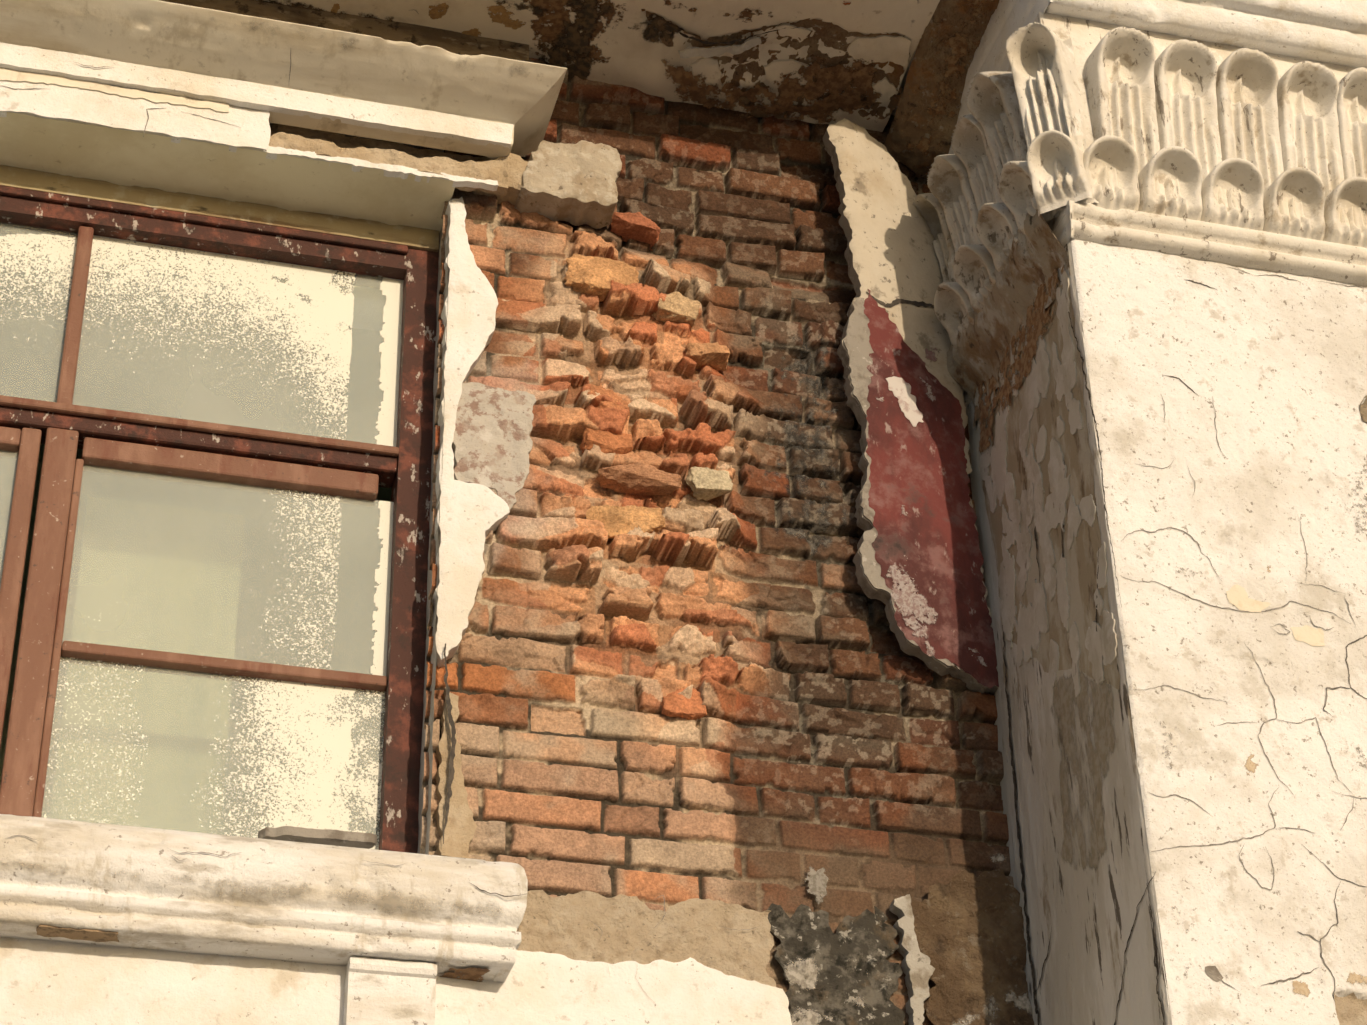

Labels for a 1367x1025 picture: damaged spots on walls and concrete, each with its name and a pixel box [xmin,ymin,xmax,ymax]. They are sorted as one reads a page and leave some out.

spalling [641,9,911,123]
spalling [269,123,508,196]
spalling [564,254,639,302]
spalling [652,291,730,371]
flaking render [452,382,536,511]
spalling [579,384,733,538]
peeling [974,270,1120,870]
crack [1034,526,1063,582]
crack [1058,272,1367,1025]
spalling [436,687,477,858]
spalling [516,890,776,987]
damp [767,903,905,1025]